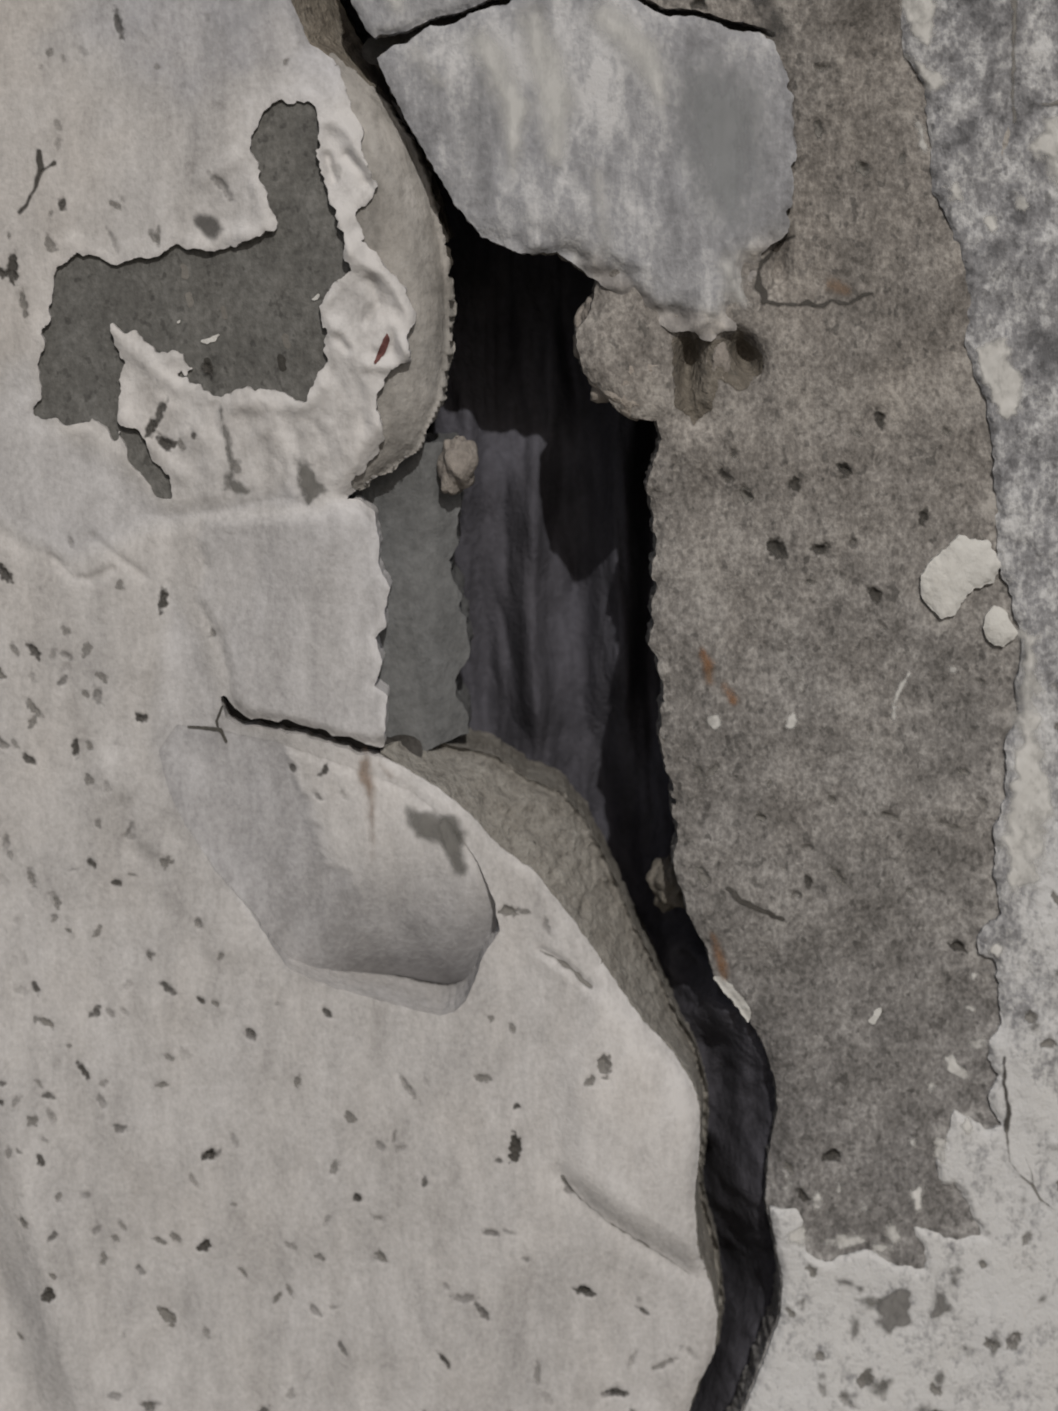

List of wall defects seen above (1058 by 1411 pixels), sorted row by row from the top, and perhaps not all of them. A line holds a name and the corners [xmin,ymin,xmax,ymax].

spalling [0,254,28,317]
peeling [34,99,351,504]
spalling [0,563,13,583]
spalling [158,590,169,614]
spalling [10,644,40,660]
crack [187,0,776,1411]
peeling [485,0,1058,1411]
spalling [71,739,92,755]
spalling [159,725,530,985]
crack [726,887,785,921]
spalling [196,1239,212,1251]
spalling [41,1274,56,1303]